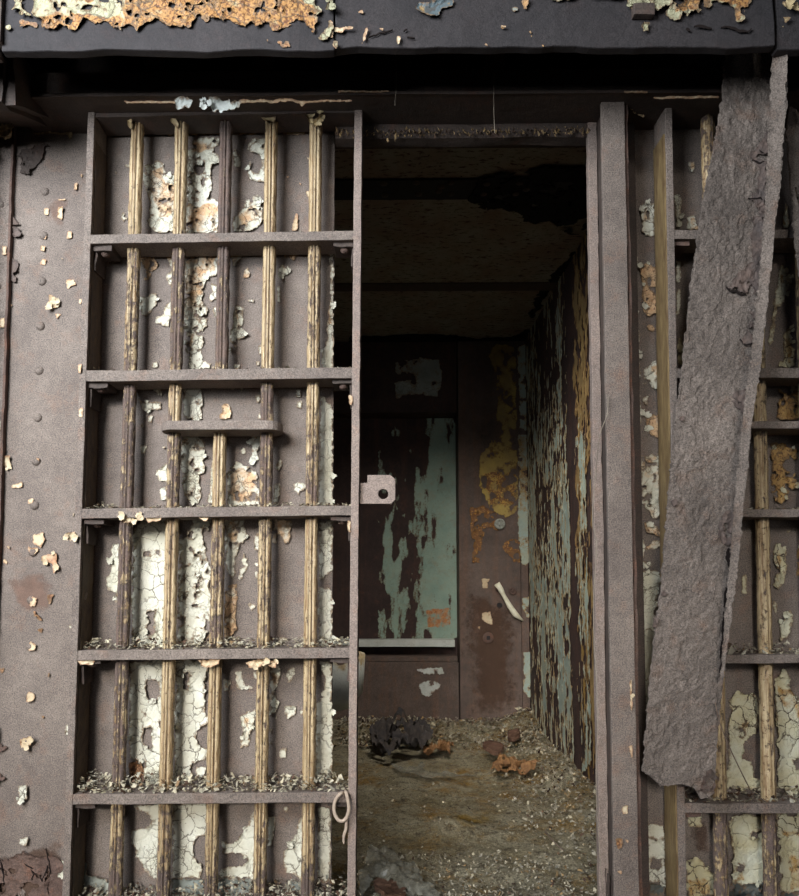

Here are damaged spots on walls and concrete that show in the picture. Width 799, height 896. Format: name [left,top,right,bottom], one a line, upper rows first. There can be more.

peeling [5,0,353,49]
peeling [626,0,751,22]
peeling [143,160,174,233]
peeling [186,133,220,234]
peeling [139,293,171,326]
peeling [639,350,658,438]
corrosion [641,52,799,799]
peeling [28,532,59,573]
peeling [170,166,597,896]
peeling [726,690,760,791]
peeling [774,668,799,794]
corrosion [0,851,63,896]